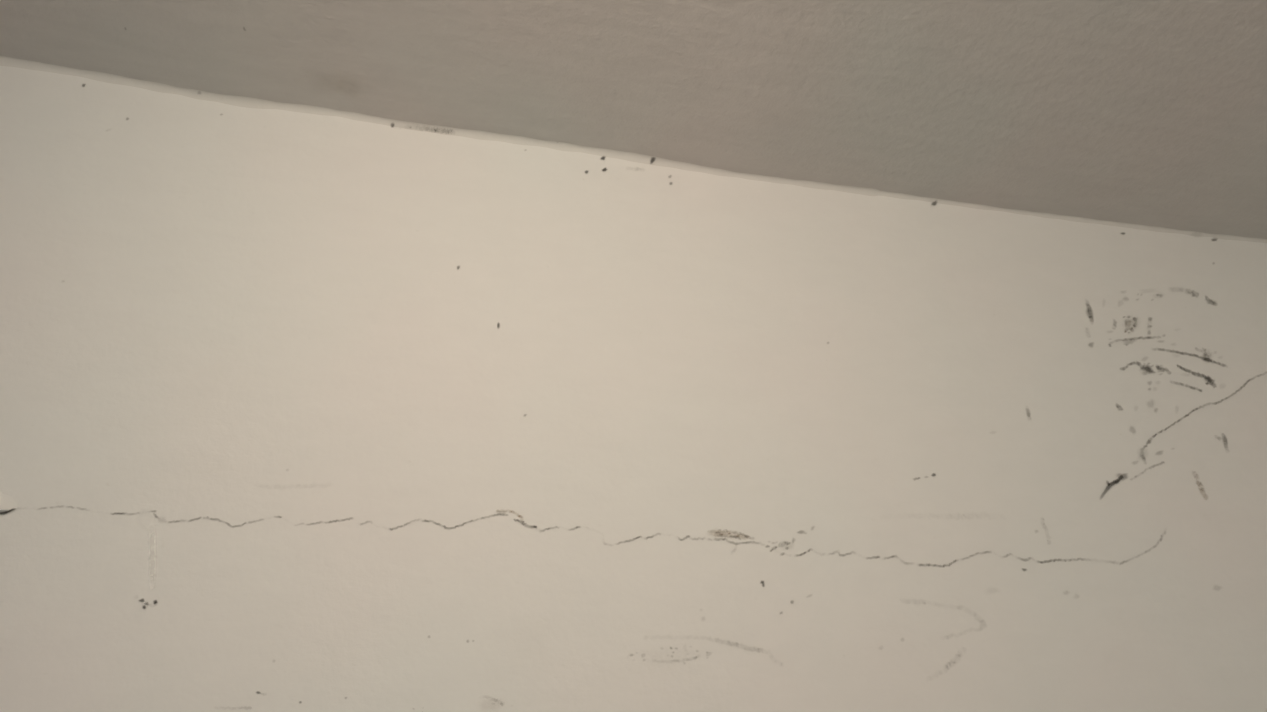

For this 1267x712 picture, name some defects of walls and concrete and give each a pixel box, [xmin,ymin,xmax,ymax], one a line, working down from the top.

crack [1105,476,1122,491]